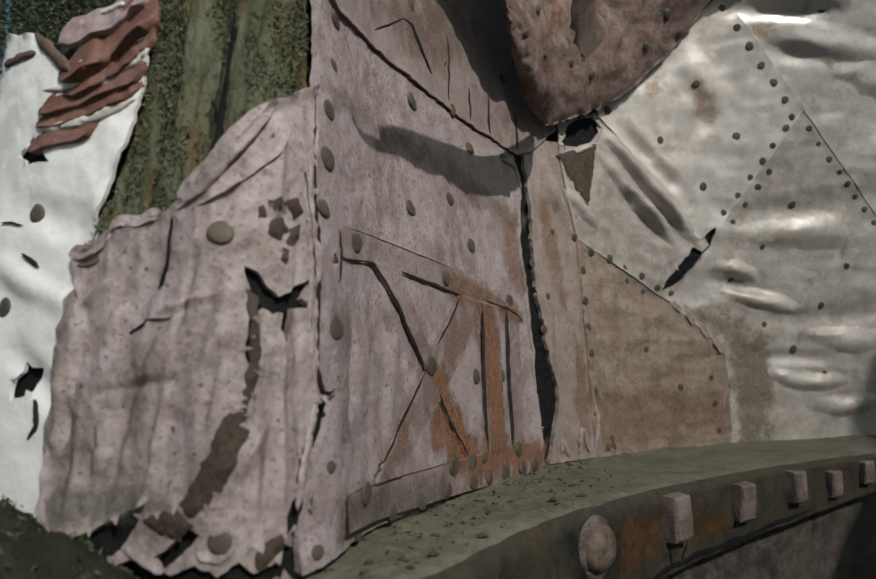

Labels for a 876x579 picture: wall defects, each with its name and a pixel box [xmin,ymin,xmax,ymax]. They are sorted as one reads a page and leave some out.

peeling [4,0,163,170]
peeling [176,102,291,209]
crack [376,18,491,137]
crack [512,115,520,150]
spalling [557,117,604,202]
peeling [68,208,162,267]
spalling [74,288,296,579]
peeling [258,146,330,515]
corrosion [432,276,548,478]